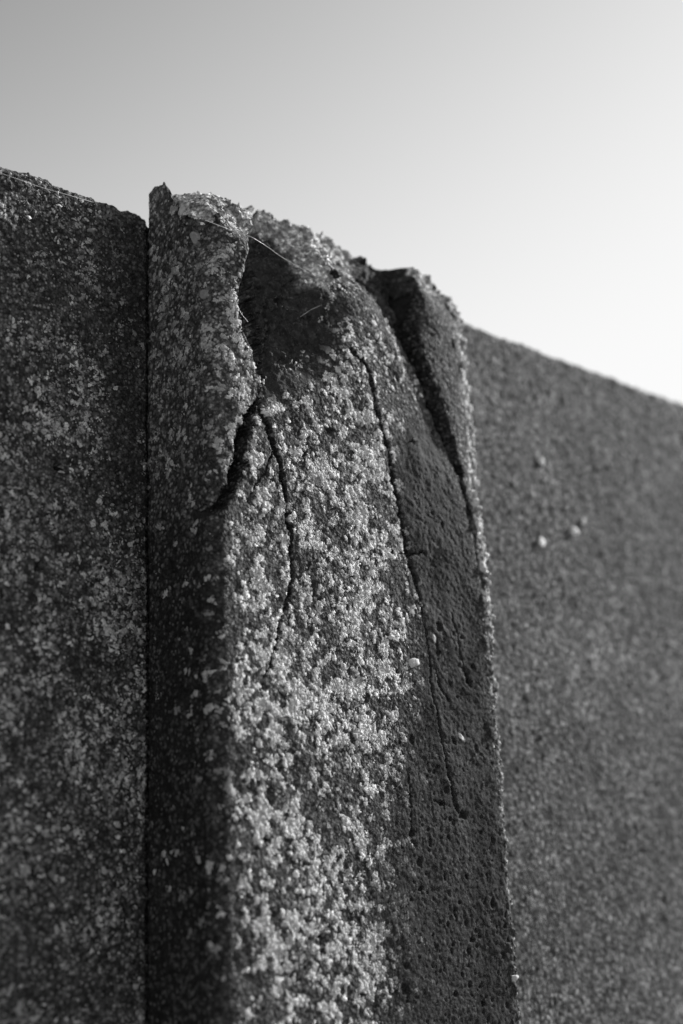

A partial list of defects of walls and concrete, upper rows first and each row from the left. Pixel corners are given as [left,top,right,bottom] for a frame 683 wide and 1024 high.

crack [389,295,420,379]
crack [192,421,269,521]